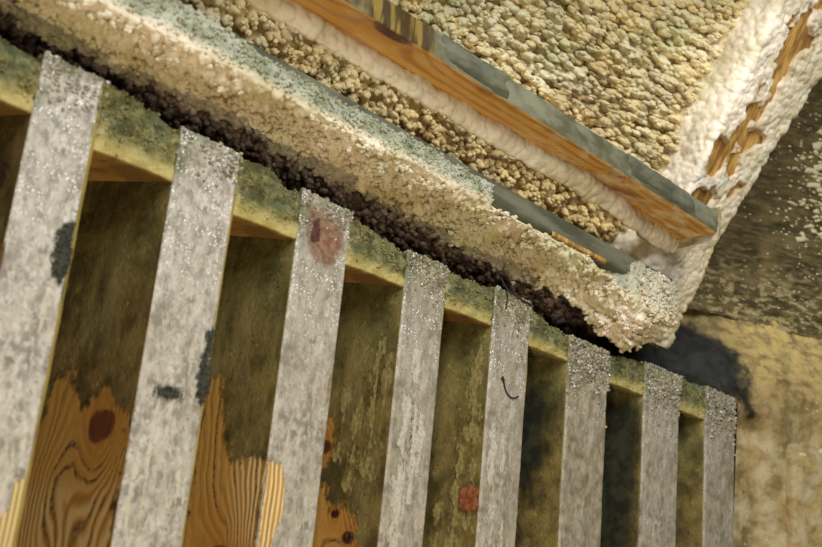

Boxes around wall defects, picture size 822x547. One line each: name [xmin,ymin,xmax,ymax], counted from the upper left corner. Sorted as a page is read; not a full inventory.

damp [2,0,822,418]
rust [308,210,342,264]
rust [458,484,479,512]